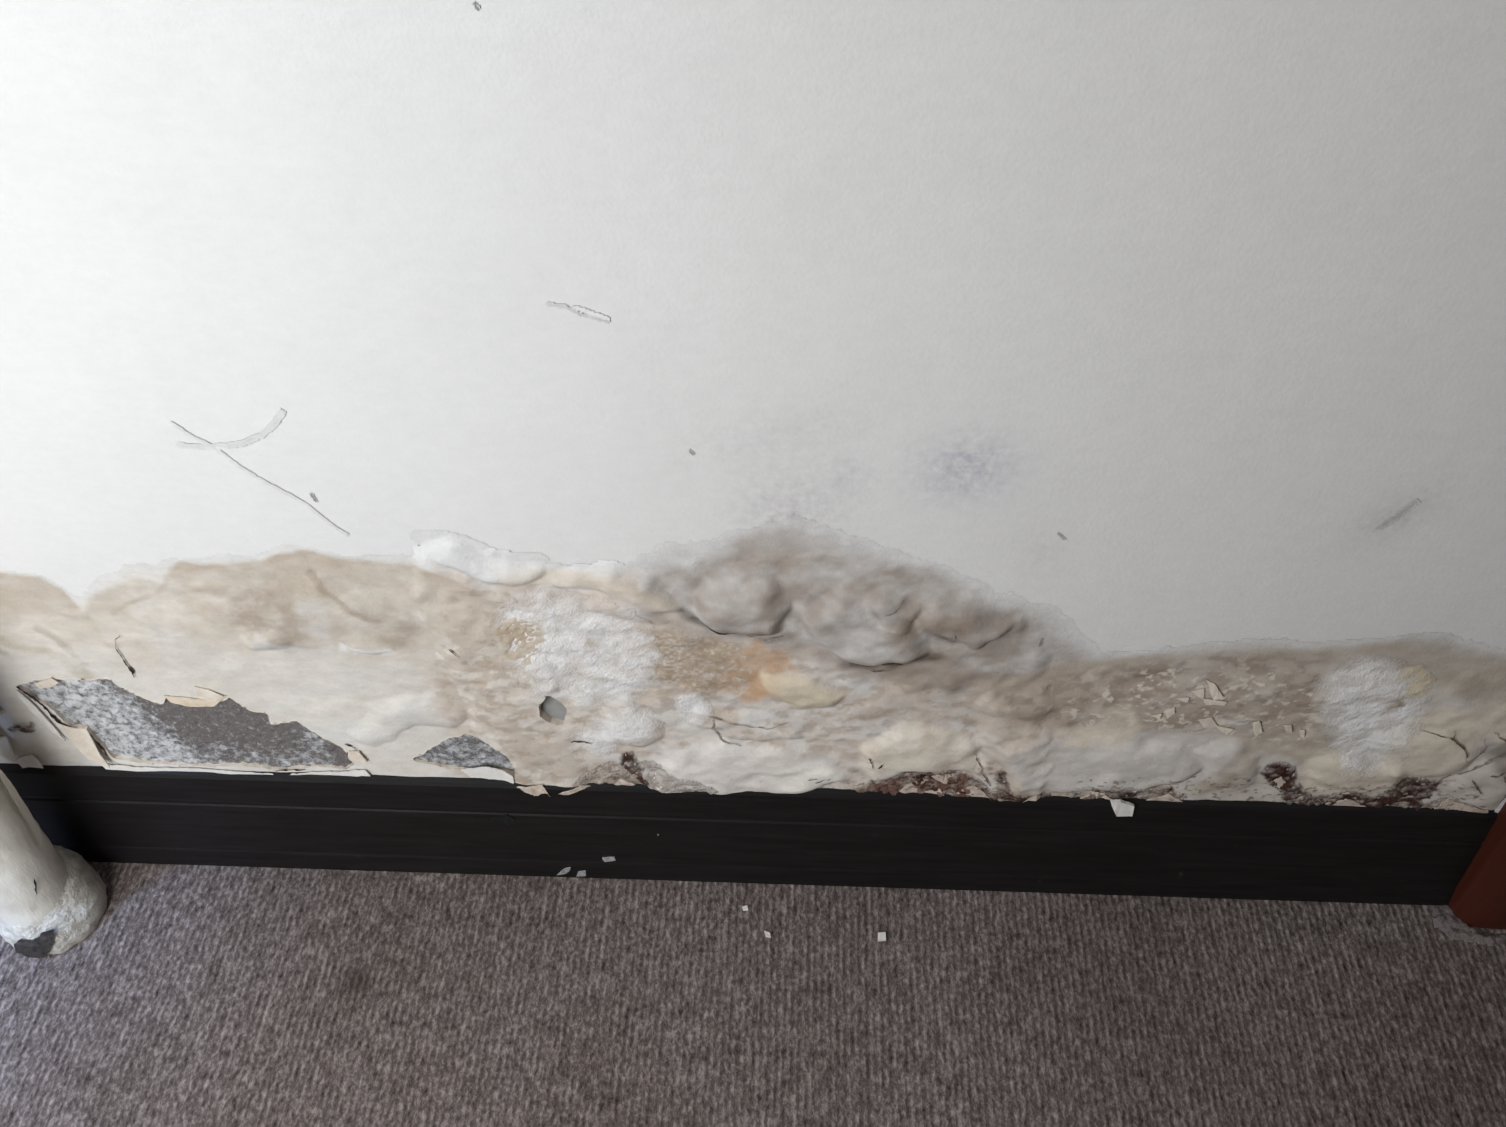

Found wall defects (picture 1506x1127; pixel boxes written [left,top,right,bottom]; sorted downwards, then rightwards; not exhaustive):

leakage [0,513,1506,811]
peeling [0,677,371,777]
peeling [410,734,719,796]
flaking render [850,770,1187,817]
flaking render [1259,761,1488,813]